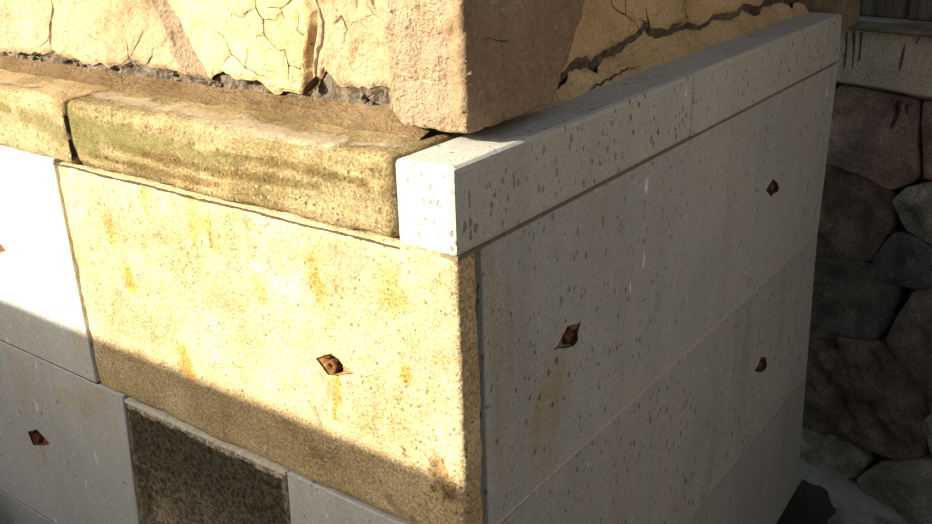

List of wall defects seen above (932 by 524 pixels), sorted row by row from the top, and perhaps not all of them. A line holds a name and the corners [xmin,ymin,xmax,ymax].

crack [611,0,694,33]
crack [119,32,154,72]
crack [208,24,268,79]
crack [234,0,376,96]
leakage [843,31,863,68]
crack [589,67,636,91]